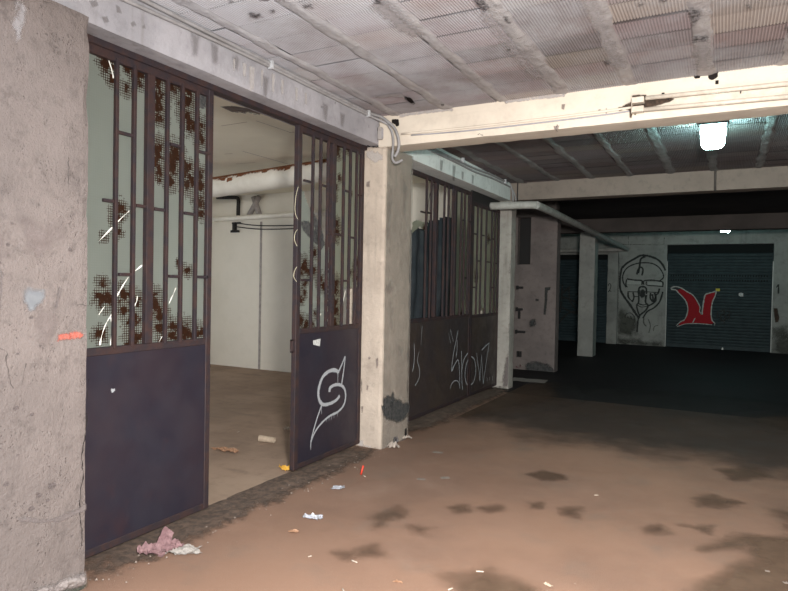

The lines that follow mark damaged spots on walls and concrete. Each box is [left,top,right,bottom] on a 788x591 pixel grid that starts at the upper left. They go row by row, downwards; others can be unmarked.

rust [213,159,327,182]